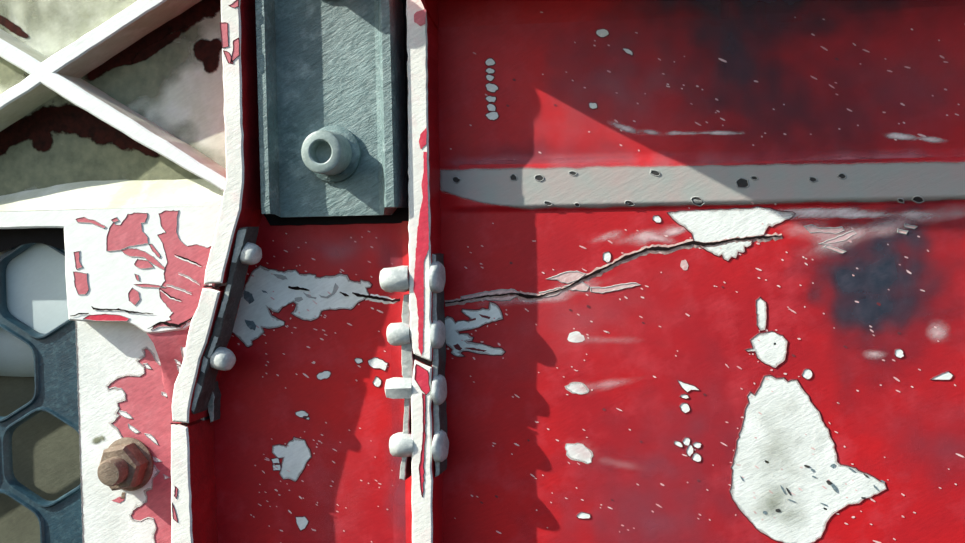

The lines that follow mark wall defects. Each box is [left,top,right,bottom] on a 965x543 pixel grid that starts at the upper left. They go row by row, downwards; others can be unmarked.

peeling [74,251,83,270]
peeling [106,212,165,270]
peeling [134,273,165,288]
crack [288,284,310,292]
peeling [232,265,373,348]
crack [339,291,400,304]
crack [445,232,783,307]
peeling [652,196,796,262]
peeling [804,224,857,254]
peeling [75,321,170,543]
peeling [270,436,312,484]
peeling [729,297,889,543]